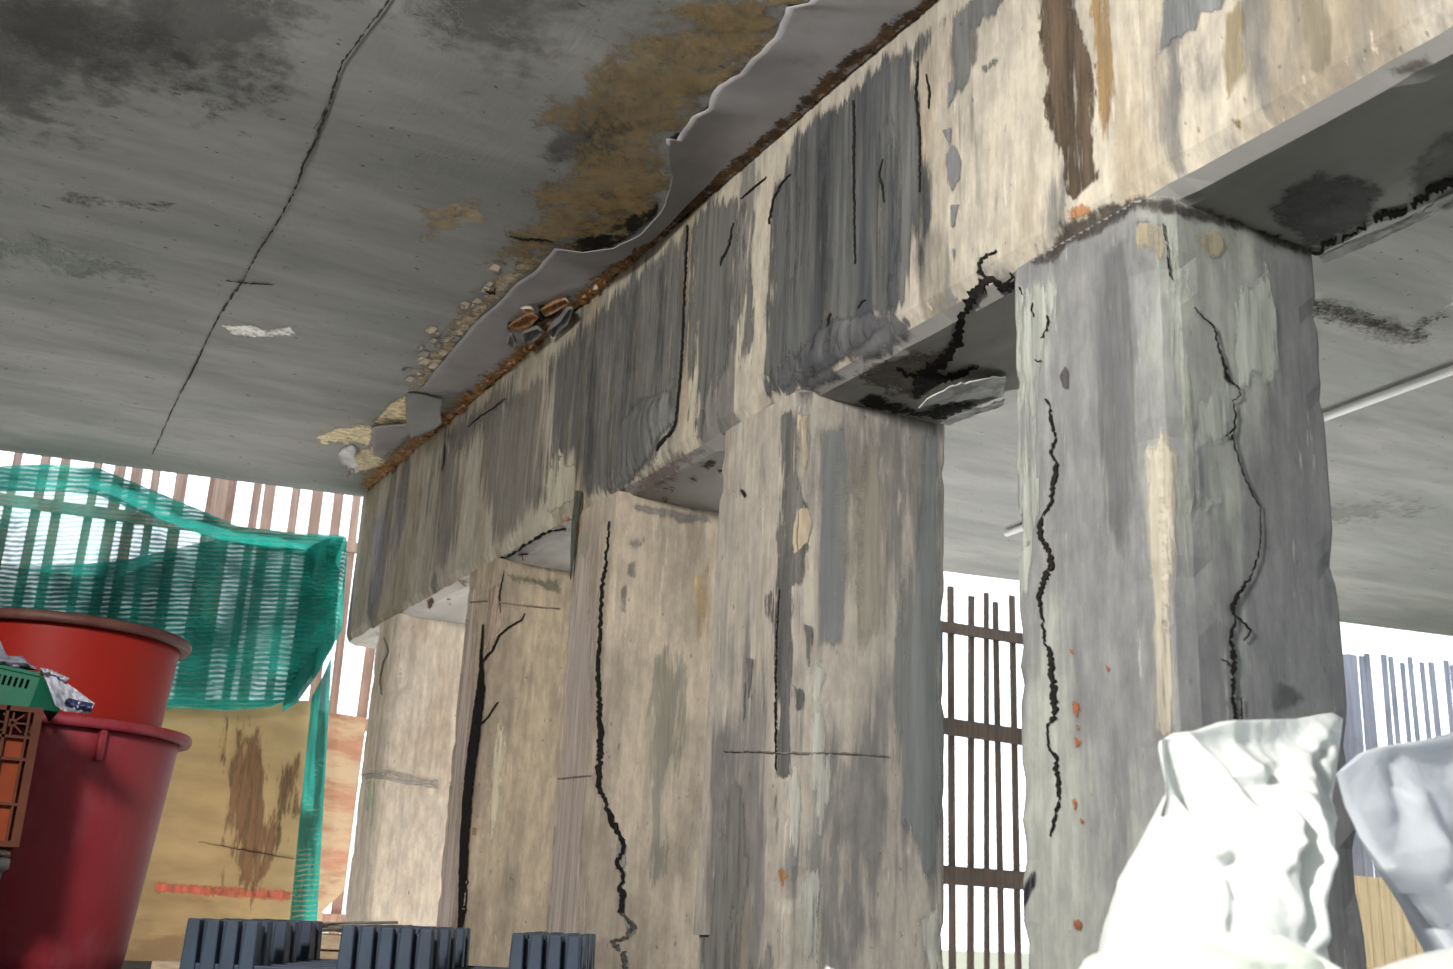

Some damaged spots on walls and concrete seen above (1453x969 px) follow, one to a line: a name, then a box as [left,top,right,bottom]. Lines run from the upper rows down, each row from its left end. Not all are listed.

crack [457,528,566,928]
leakage [429,226,708,569]
crack [557,521,637,969]
flaking render [316,0,935,480]
corrosion [358,0,939,493]
leakage [495,0,805,263]
peeling [793,508,812,554]
leakage [763,30,932,856]
crack [896,249,1049,385]
crack [1036,399,1061,836]
spalling [1312,296,1450,346]
flaking render [1311,176,1453,264]